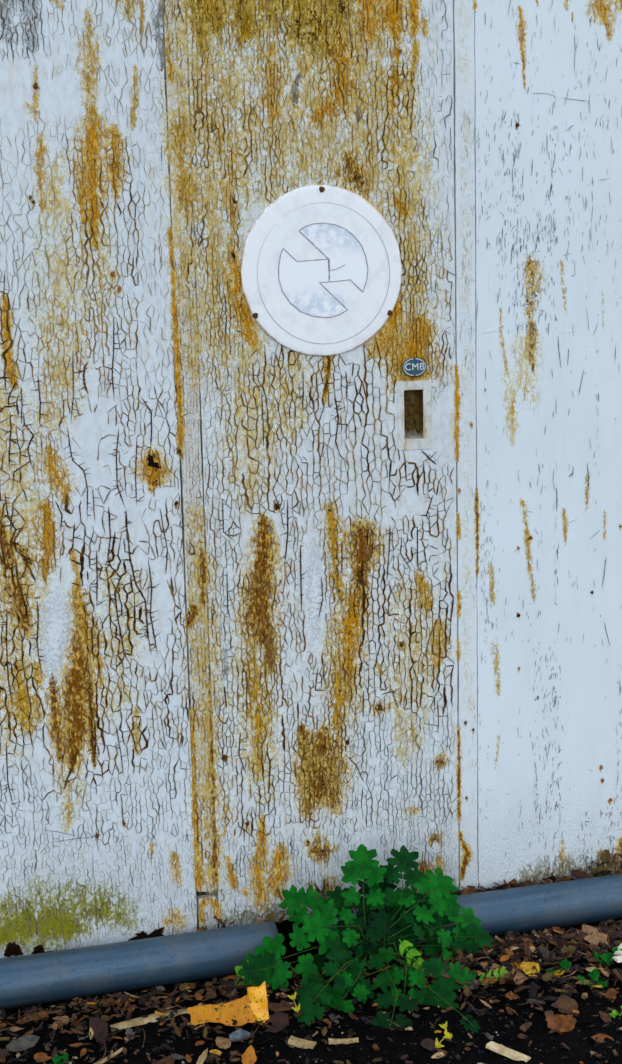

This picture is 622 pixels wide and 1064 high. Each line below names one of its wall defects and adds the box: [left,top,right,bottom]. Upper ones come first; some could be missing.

crack [461,111,613,349]
crack [541,95,610,186]
crack [574,35,617,90]
rust [588,0,622,41]
rust [0,9,146,832]
rust [134,447,171,492]
rust [162,0,473,925]
crack [466,481,505,663]
rust [500,255,543,445]
rust [517,499,536,601]
crack [505,430,622,884]
water stain [0,877,138,952]